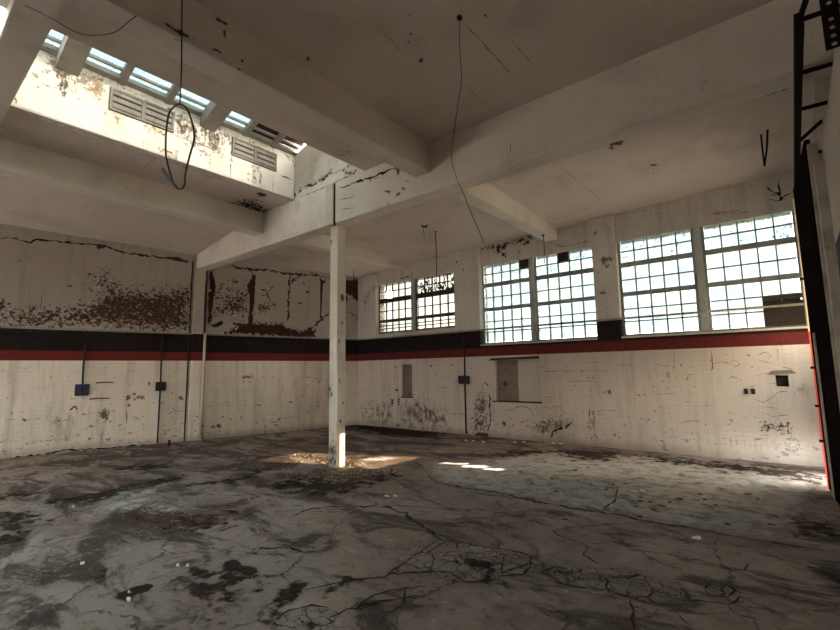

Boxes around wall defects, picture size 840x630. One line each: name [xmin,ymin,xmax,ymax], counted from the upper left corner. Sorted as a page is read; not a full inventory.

peeling [76,75,106,101]
spalling [231,192,272,213]
crack [339,167,410,209]
crack [0,231,182,261]
peeling [0,267,194,336]
flaking render [207,270,317,339]
water stain [351,425,446,438]
crack [235,475,837,630]